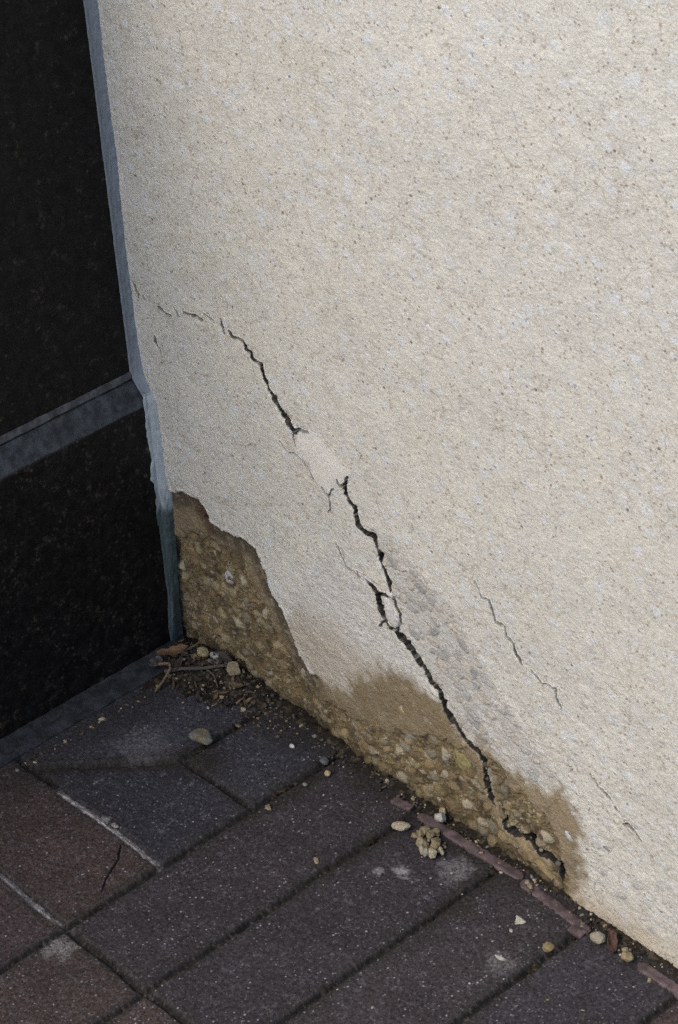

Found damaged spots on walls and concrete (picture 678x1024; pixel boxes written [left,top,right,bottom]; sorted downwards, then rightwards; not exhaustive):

crack [131,278,567,883]
spalling [176,520,573,897]
leakage [168,487,600,912]